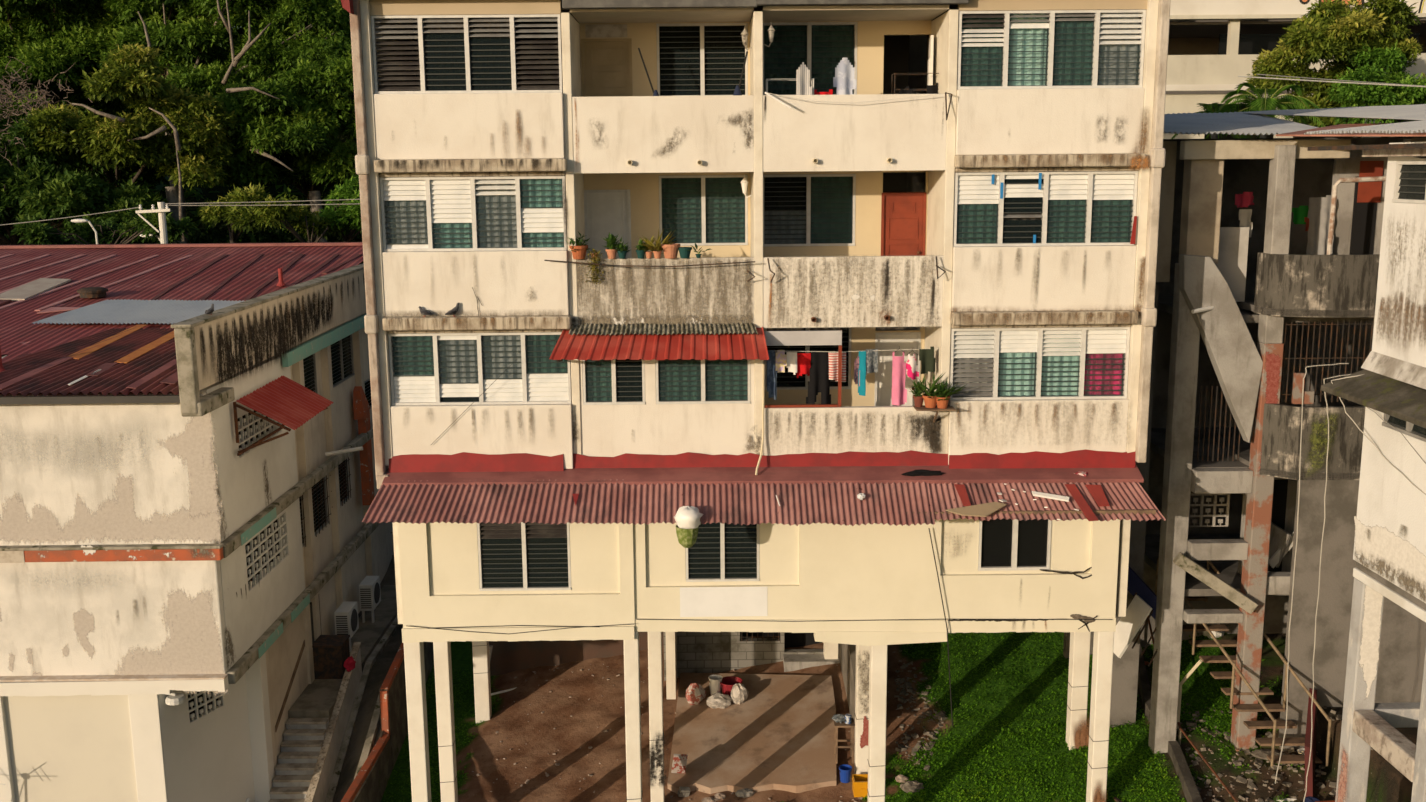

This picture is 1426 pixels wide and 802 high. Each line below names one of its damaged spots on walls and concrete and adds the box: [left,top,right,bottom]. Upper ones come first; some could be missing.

water stain [730,96,766,147]
water stain [200,276,365,384]
water stain [385,292,561,326]
water stain [576,259,753,321]
water stain [770,257,1146,327]
water stain [1379,283,1426,340]
water stain [788,406,959,453]
peeling [0,412,221,560]
peeling [8,648,41,676]
peeling [63,609,95,657]
peeling [115,590,228,694]